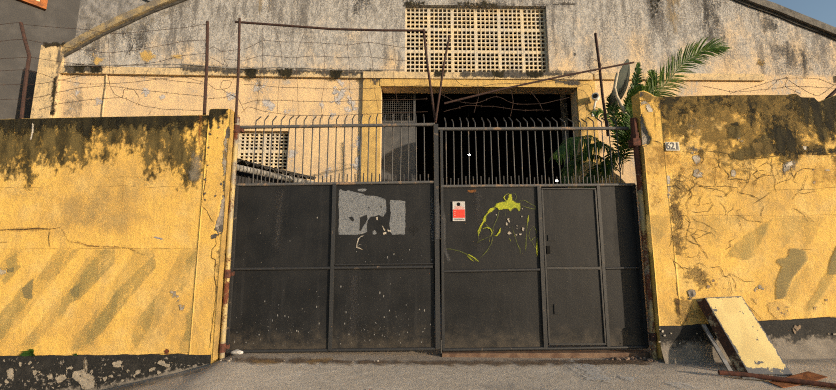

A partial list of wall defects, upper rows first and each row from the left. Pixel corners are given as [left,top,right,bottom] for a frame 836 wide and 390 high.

damp [113,17,154,56]
damp [446,0,515,9]
damp [647,0,679,33]
damp [702,0,726,42]
damp [181,63,382,87]
damp [460,69,581,85]
damp [772,41,816,77]
damp [0,41,228,191]
damp [640,91,836,178]
crack [651,136,836,297]
crack [0,227,188,255]
peeling [3,359,170,390]